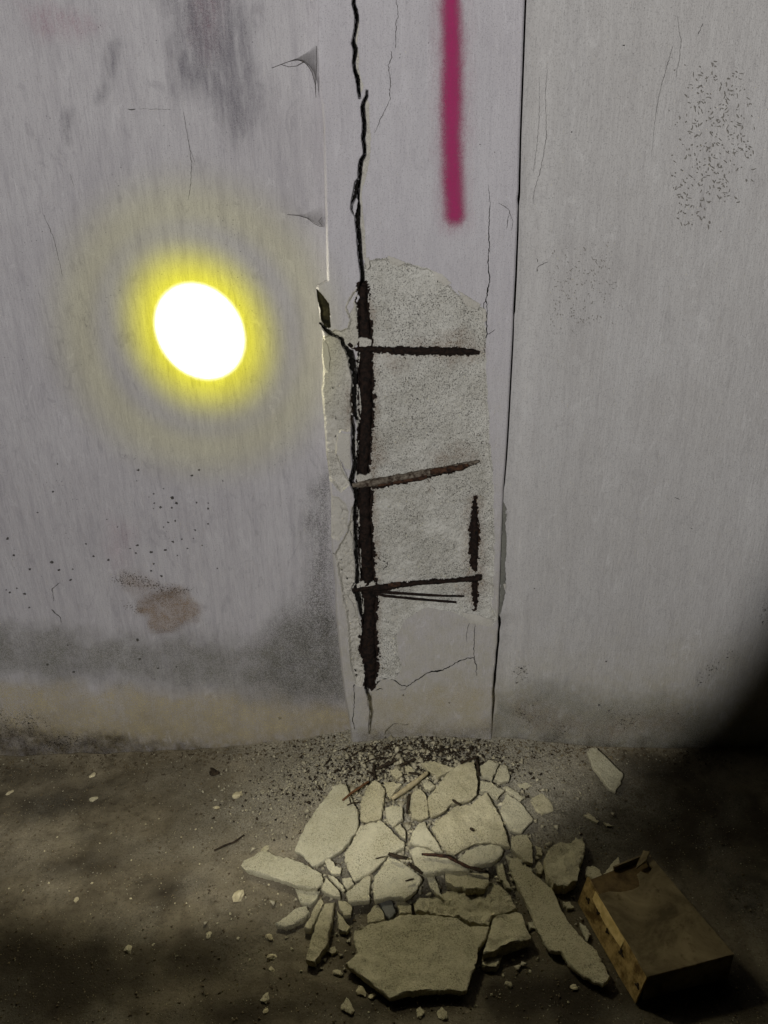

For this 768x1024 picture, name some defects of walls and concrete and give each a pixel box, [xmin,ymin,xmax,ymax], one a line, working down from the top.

crack [351,0,398,284]
crack [483,0,548,482]
spalling [316,256,508,687]
corrosion [378,463,469,487]
crack [352,615,501,734]